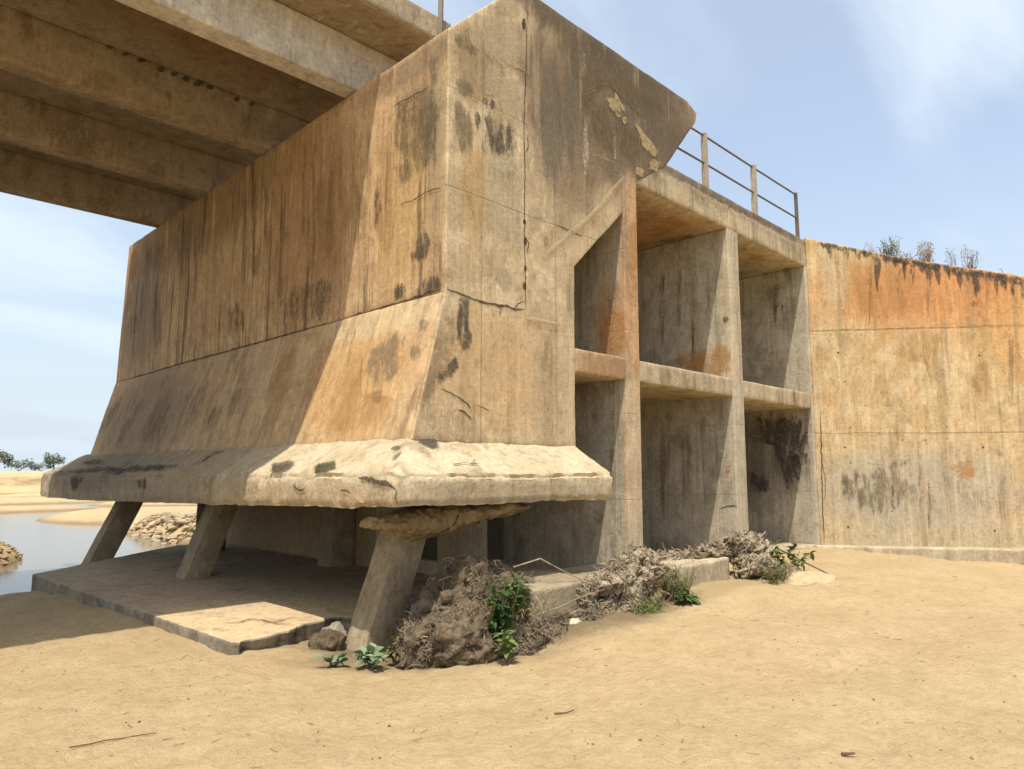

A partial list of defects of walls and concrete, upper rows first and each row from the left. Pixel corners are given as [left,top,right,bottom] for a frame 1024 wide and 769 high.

damp [449,82,515,197]
spalling [607,93,661,176]
crack [123,9,582,381]
damp [394,276,441,299]
damp [410,232,430,260]
damp [820,242,1024,296]
damp [424,295,472,395]
mould [751,411,808,488]
damp [842,462,921,511]